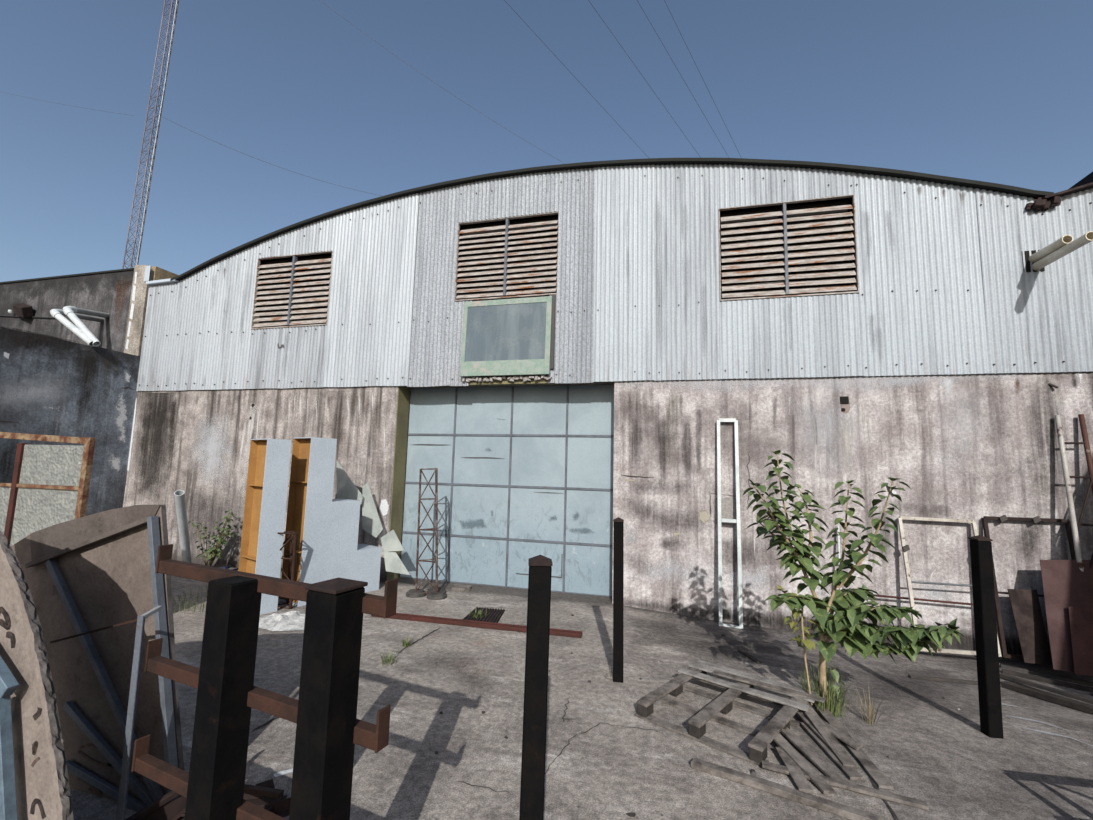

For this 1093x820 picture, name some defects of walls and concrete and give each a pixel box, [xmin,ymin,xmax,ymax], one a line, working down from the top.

leakage [0,327,108,393]
leakage [140,392,175,492]
leakage [239,412,259,480]
crack [545,699,659,774]